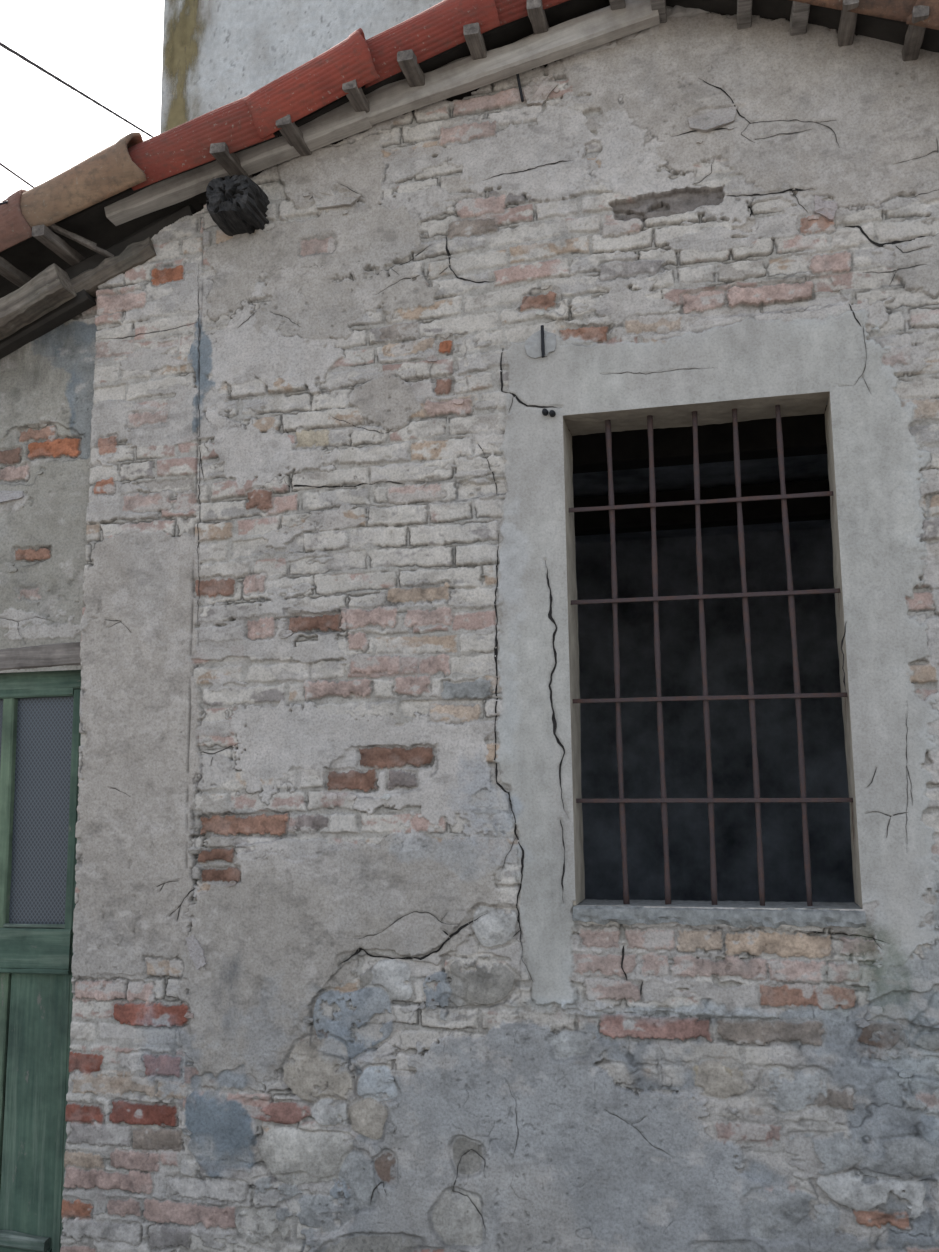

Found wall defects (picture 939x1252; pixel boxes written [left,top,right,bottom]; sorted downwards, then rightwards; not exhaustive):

damp [163,0,204,131]
crack [671,78,839,145]
spalling [609,184,725,222]
crack [500,350,557,411]
spalling [323,742,439,801]
crack [494,535,532,979]
crack [545,560,567,903]
spalling [187,808,297,887]
crack [339,911,485,965]
spalling [575,923,939,1080]
spalling [60,902,523,1252]
spalling [810,1167,938,1221]